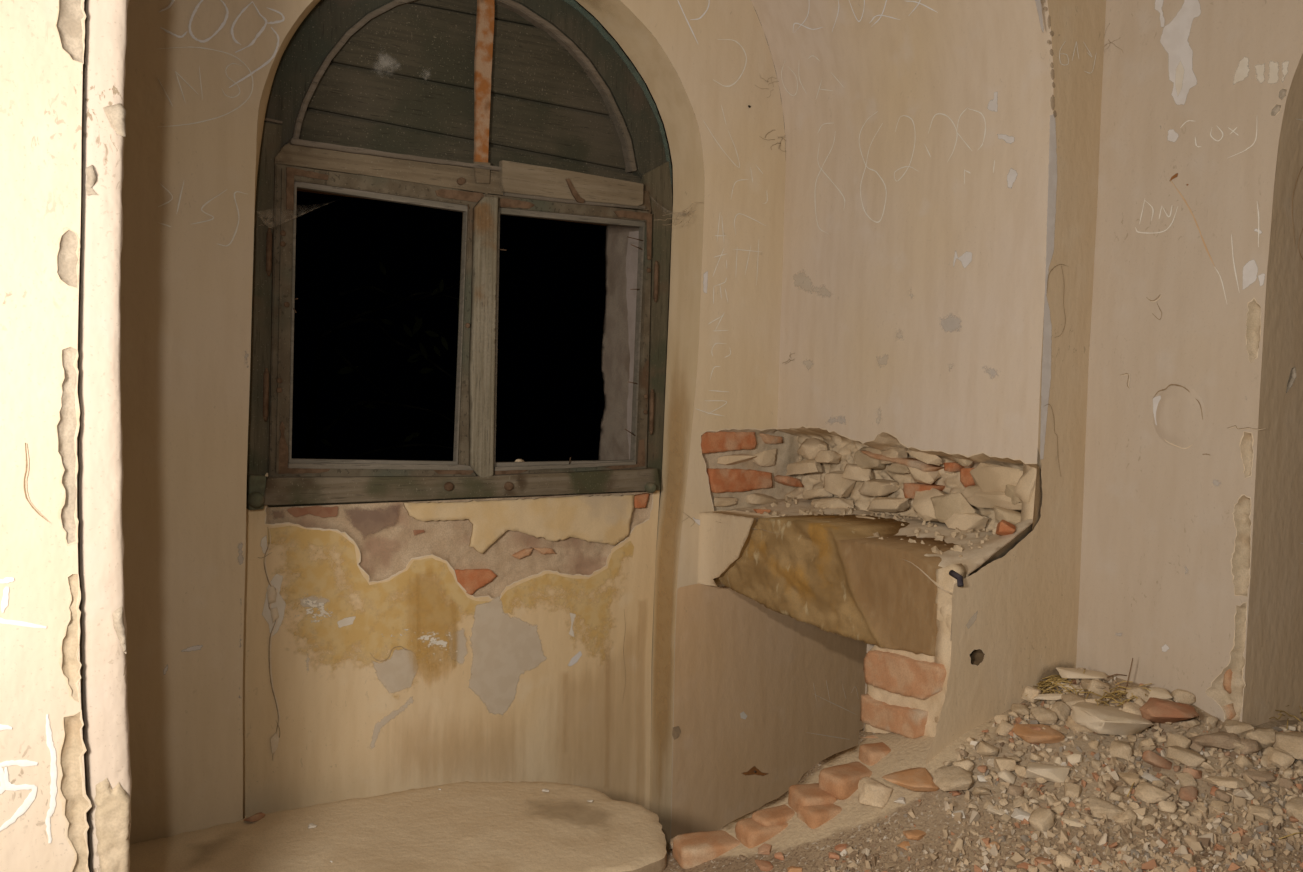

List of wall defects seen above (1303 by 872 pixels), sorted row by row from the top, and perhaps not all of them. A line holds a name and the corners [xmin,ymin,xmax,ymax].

flaking render [56,229,80,289]
flaking render [54,0,86,64]
flaking render [85,165,98,195]
flaking render [103,103,126,137]
peeling [1155,0,1201,105]
flaking render [54,347,80,546]
spalling [693,0,1057,739]
flaking render [261,492,653,748]
flaking render [1205,494,1252,721]
flaking render [58,573,131,872]